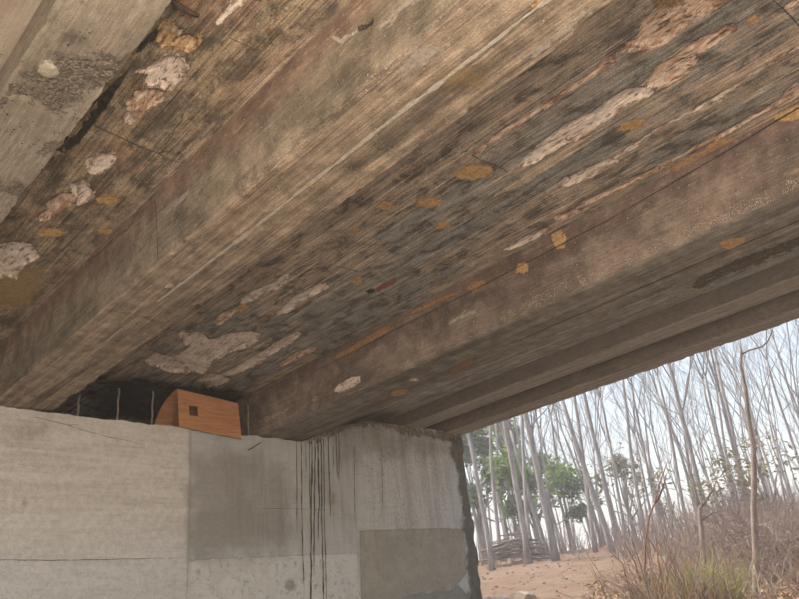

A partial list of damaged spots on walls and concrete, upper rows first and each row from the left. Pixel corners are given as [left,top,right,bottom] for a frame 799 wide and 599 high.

spalling [35,151,117,223]
crack [84,114,183,163]
spalling [122,20,203,125]
spalling [472,0,738,168]
spalling [558,46,799,187]
spalling [0,241,41,280]
spalling [144,273,320,389]
spalling [334,376,361,393]
leakage [296,437,340,599]
leakage [360,434,483,599]